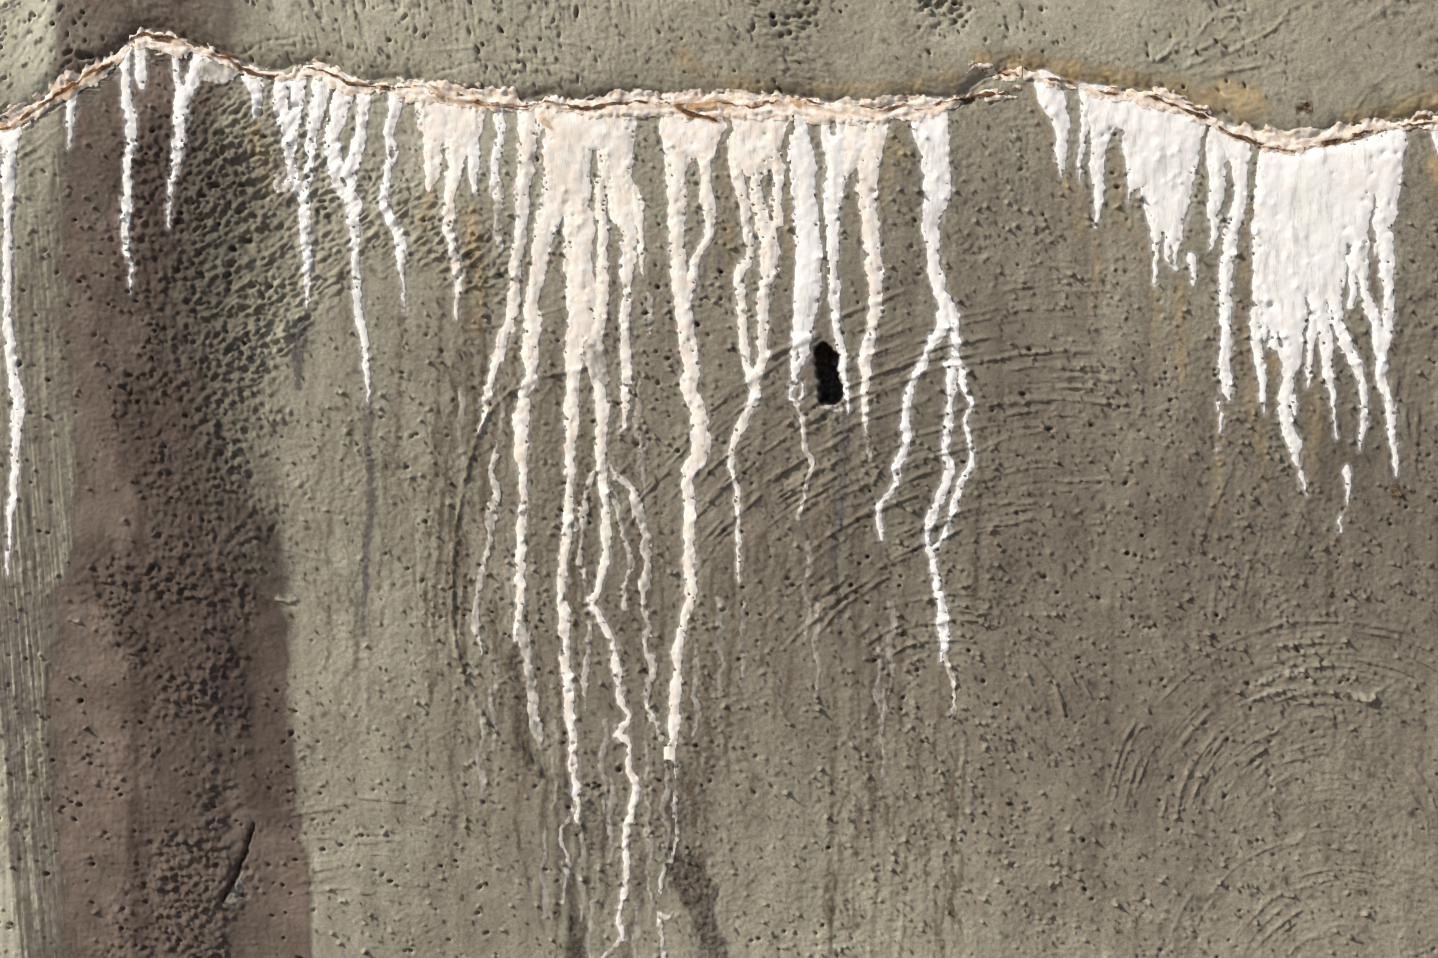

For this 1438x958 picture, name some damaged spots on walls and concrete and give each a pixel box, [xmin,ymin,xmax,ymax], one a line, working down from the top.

water stain [0,0,889,958]
crack [0,27,1438,156]
water stain [858,98,975,734]
water stain [1034,70,1408,544]
water stain [916,743,967,958]